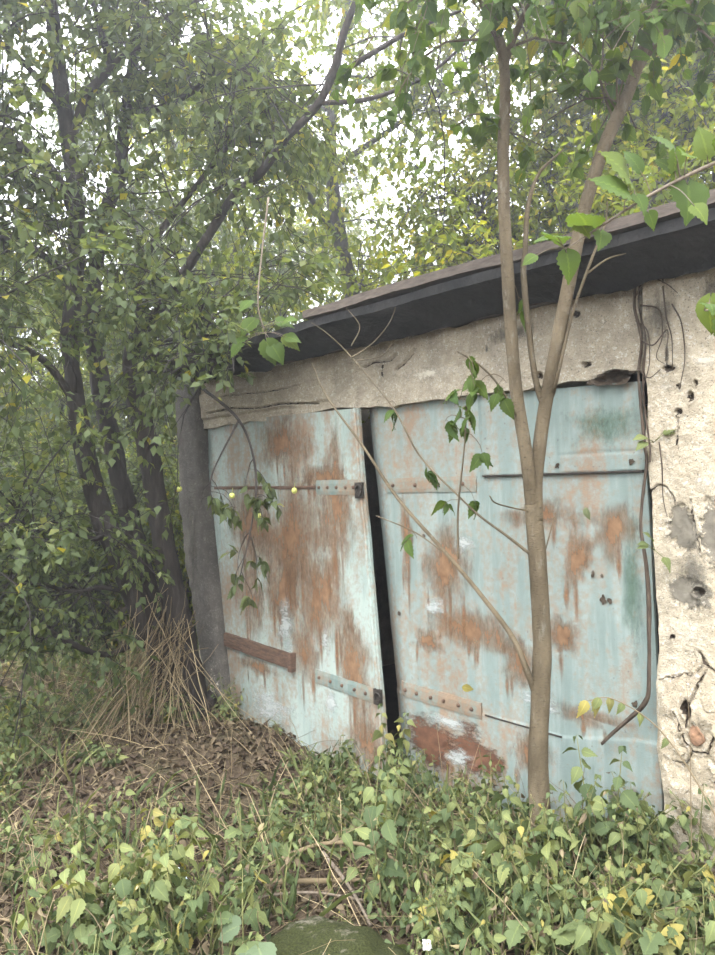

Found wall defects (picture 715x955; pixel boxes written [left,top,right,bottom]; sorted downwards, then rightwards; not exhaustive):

spalling [585,362,636,386]
corrosion [402,509,413,603]
corrosion [416,528,531,693]
corrosion [551,621,573,667]
corrosion [564,507,627,608]
flaking render [664,497,715,568]
flaking render [669,575,712,609]
spalling [680,700,691,718]
crack [659,652,715,765]
corrosion [408,716,505,786]